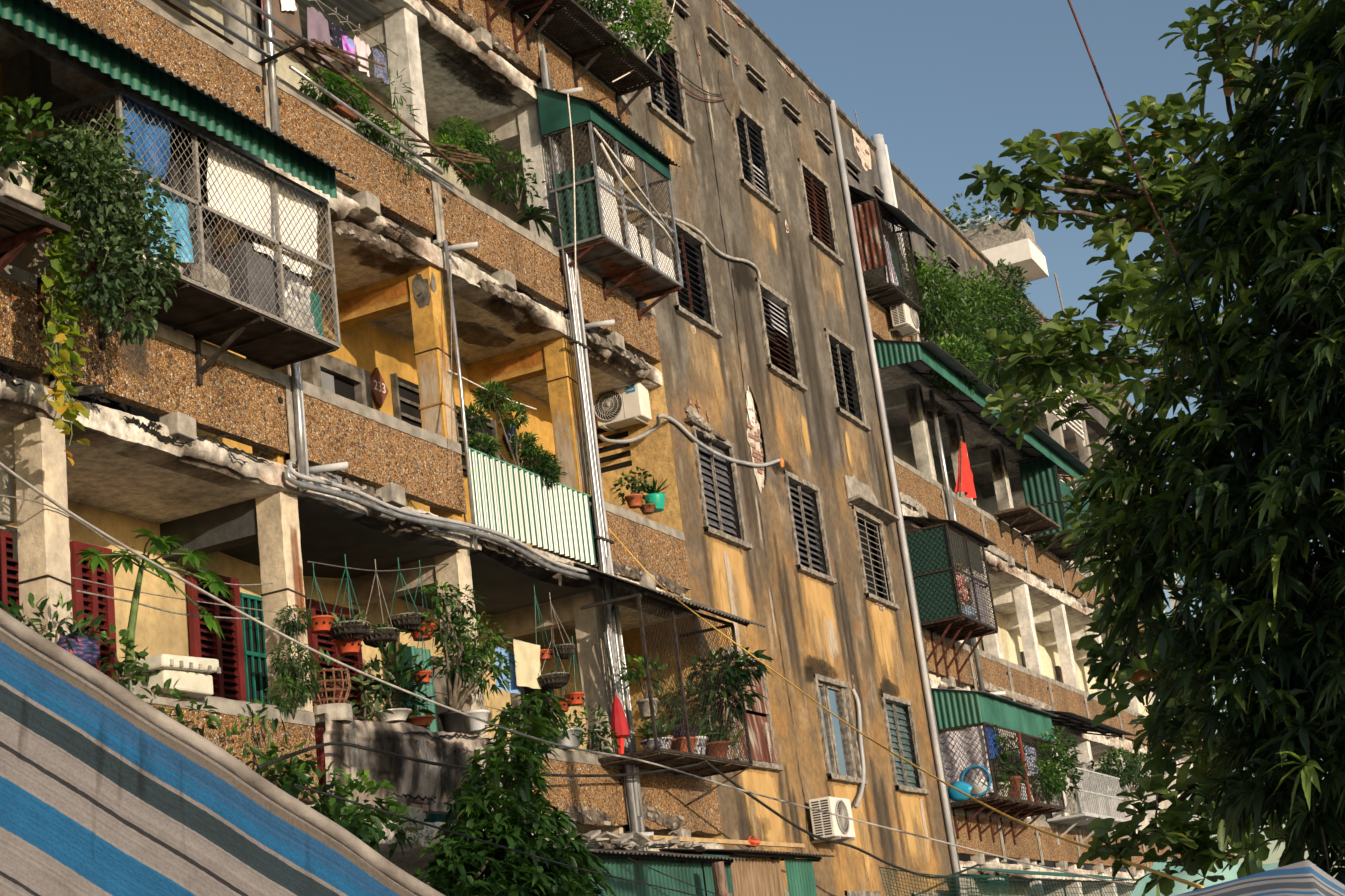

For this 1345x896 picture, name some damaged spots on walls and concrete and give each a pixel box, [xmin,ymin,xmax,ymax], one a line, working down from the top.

flaking render [745,386,767,492]
leakage [703,537,757,649]
leakage [775,536,861,697]
leakage [865,598,903,708]
leakage [734,768,802,851]
leakage [826,762,933,880]